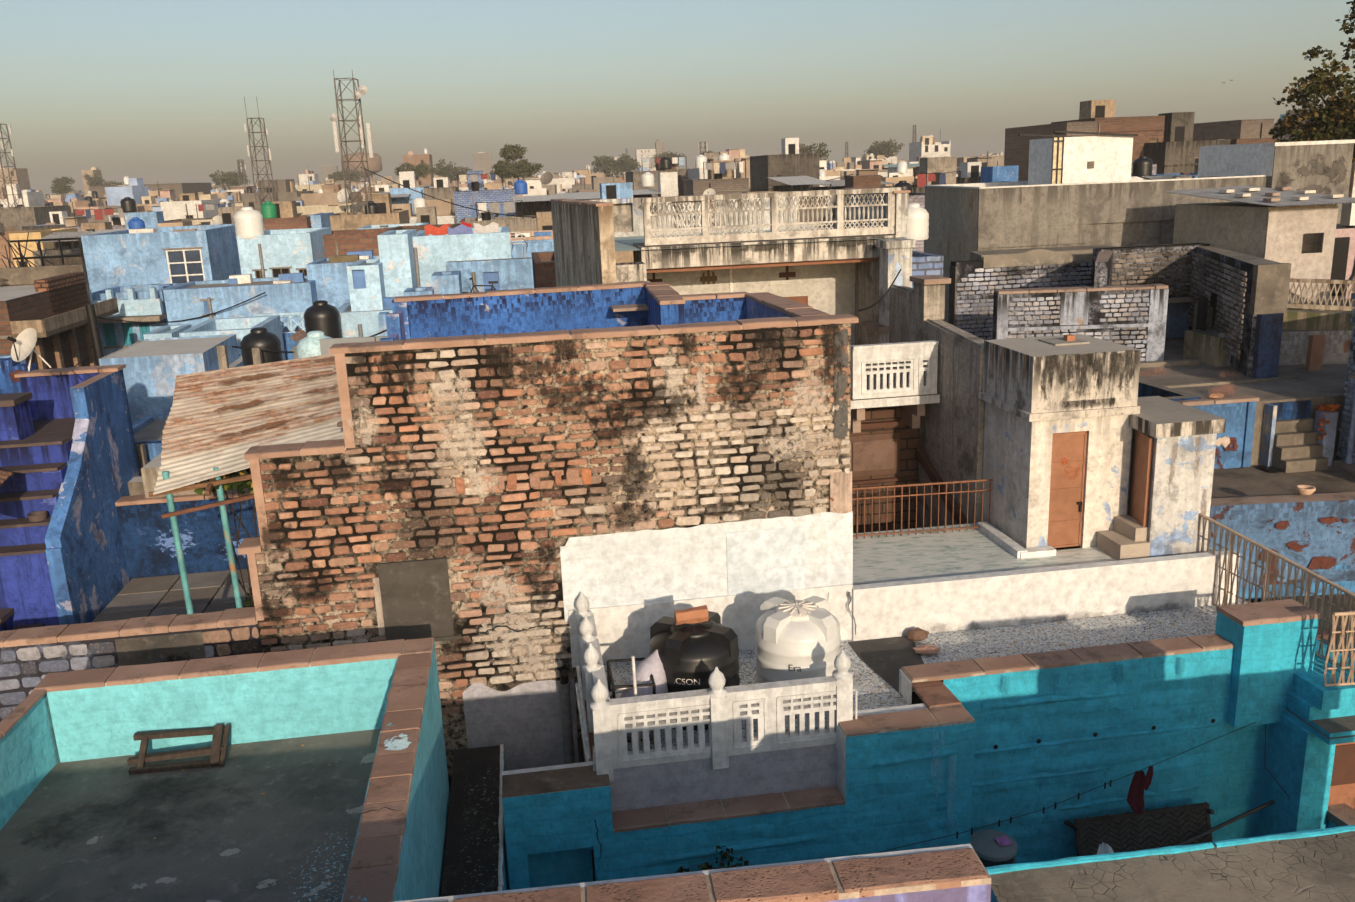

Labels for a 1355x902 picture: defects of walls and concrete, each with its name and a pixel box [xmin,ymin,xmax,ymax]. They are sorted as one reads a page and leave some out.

water stain [352,353,414,395]
water stain [755,327,781,361]
water stain [791,324,843,413]
water stain [1041,350,1165,409]
water stain [434,376,499,497]
water stain [485,333,763,528]
water stain [761,432,821,461]
water stain [372,452,414,500]
peeling [1259,520,1337,570]
peeling [1318,516,1352,524]
water stain [261,565,338,623]
water stain [472,545,562,673]